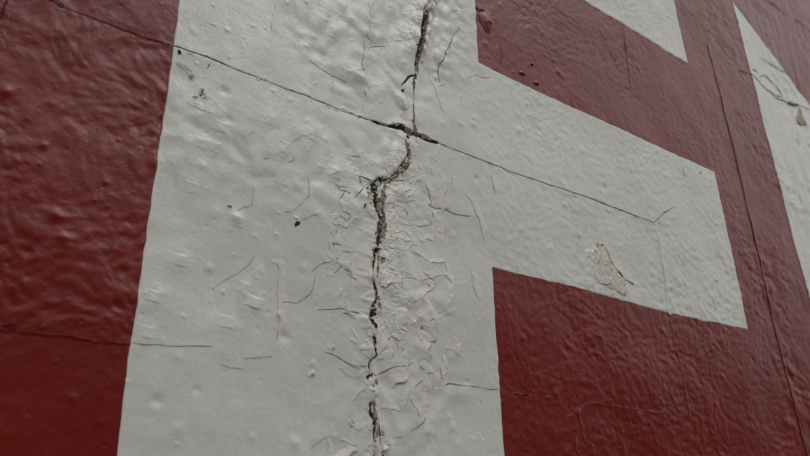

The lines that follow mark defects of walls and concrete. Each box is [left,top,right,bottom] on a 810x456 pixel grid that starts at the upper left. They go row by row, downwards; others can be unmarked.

crack [50,0,674,456]
peeling [371,153,471,374]
peeling [796,110,808,126]